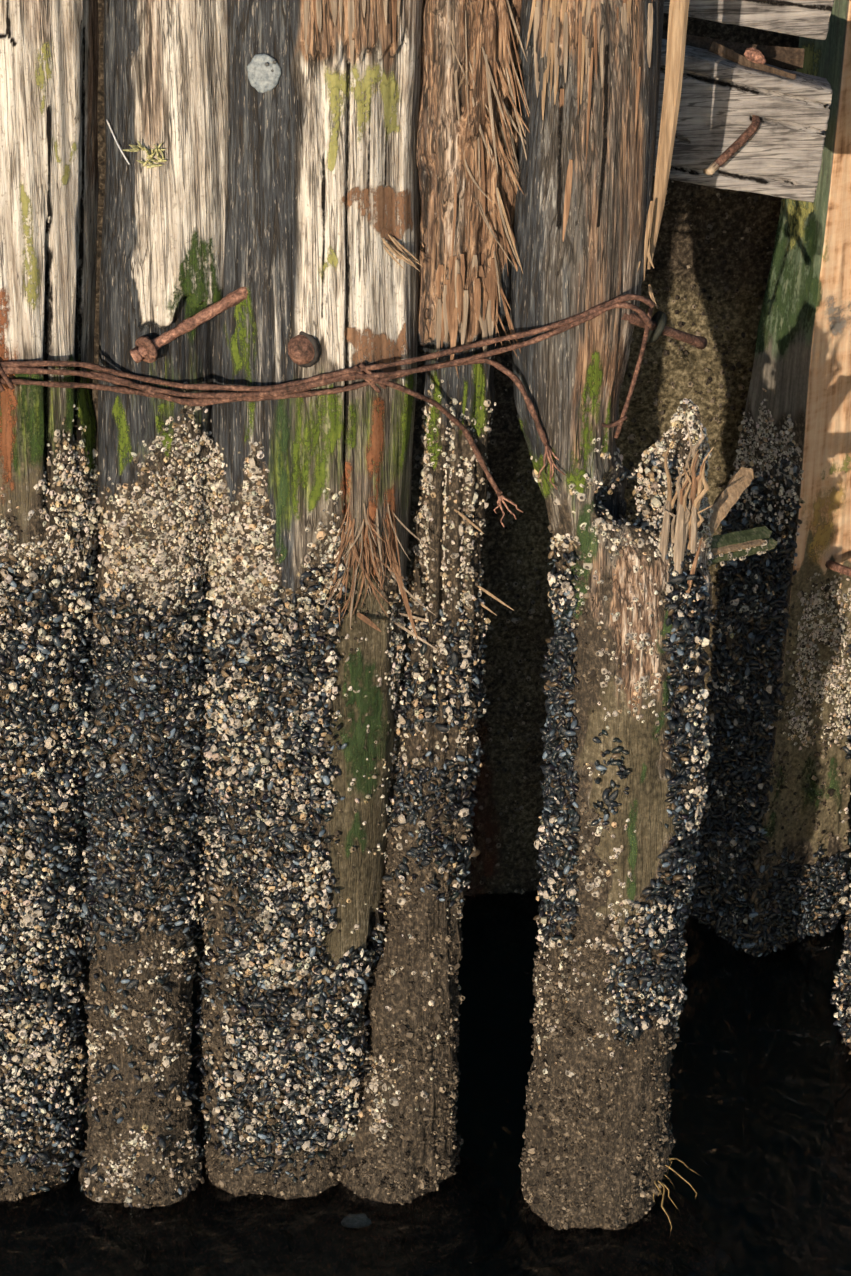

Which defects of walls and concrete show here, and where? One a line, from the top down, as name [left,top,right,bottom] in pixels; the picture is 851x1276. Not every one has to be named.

rust [0,288,17,499]